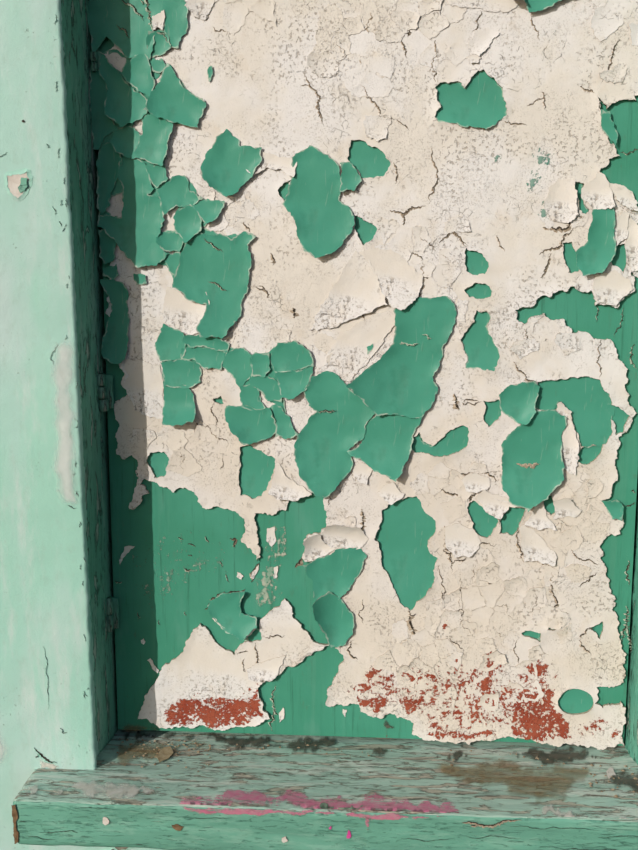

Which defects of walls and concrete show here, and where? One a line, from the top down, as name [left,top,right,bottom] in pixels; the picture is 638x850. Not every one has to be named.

crack [580,40,620,93]
crack [302,74,324,125]
crack [362,86,409,130]
crack [505,92,546,126]
flaking render [4,168,33,201]
crack [390,148,439,226]
crack [411,231,467,297]
crack [539,215,582,278]
peeling [87,0,638,750]
corrosion [164,683,263,729]
corrosion [348,652,572,743]
corrosion [580,717,621,737]